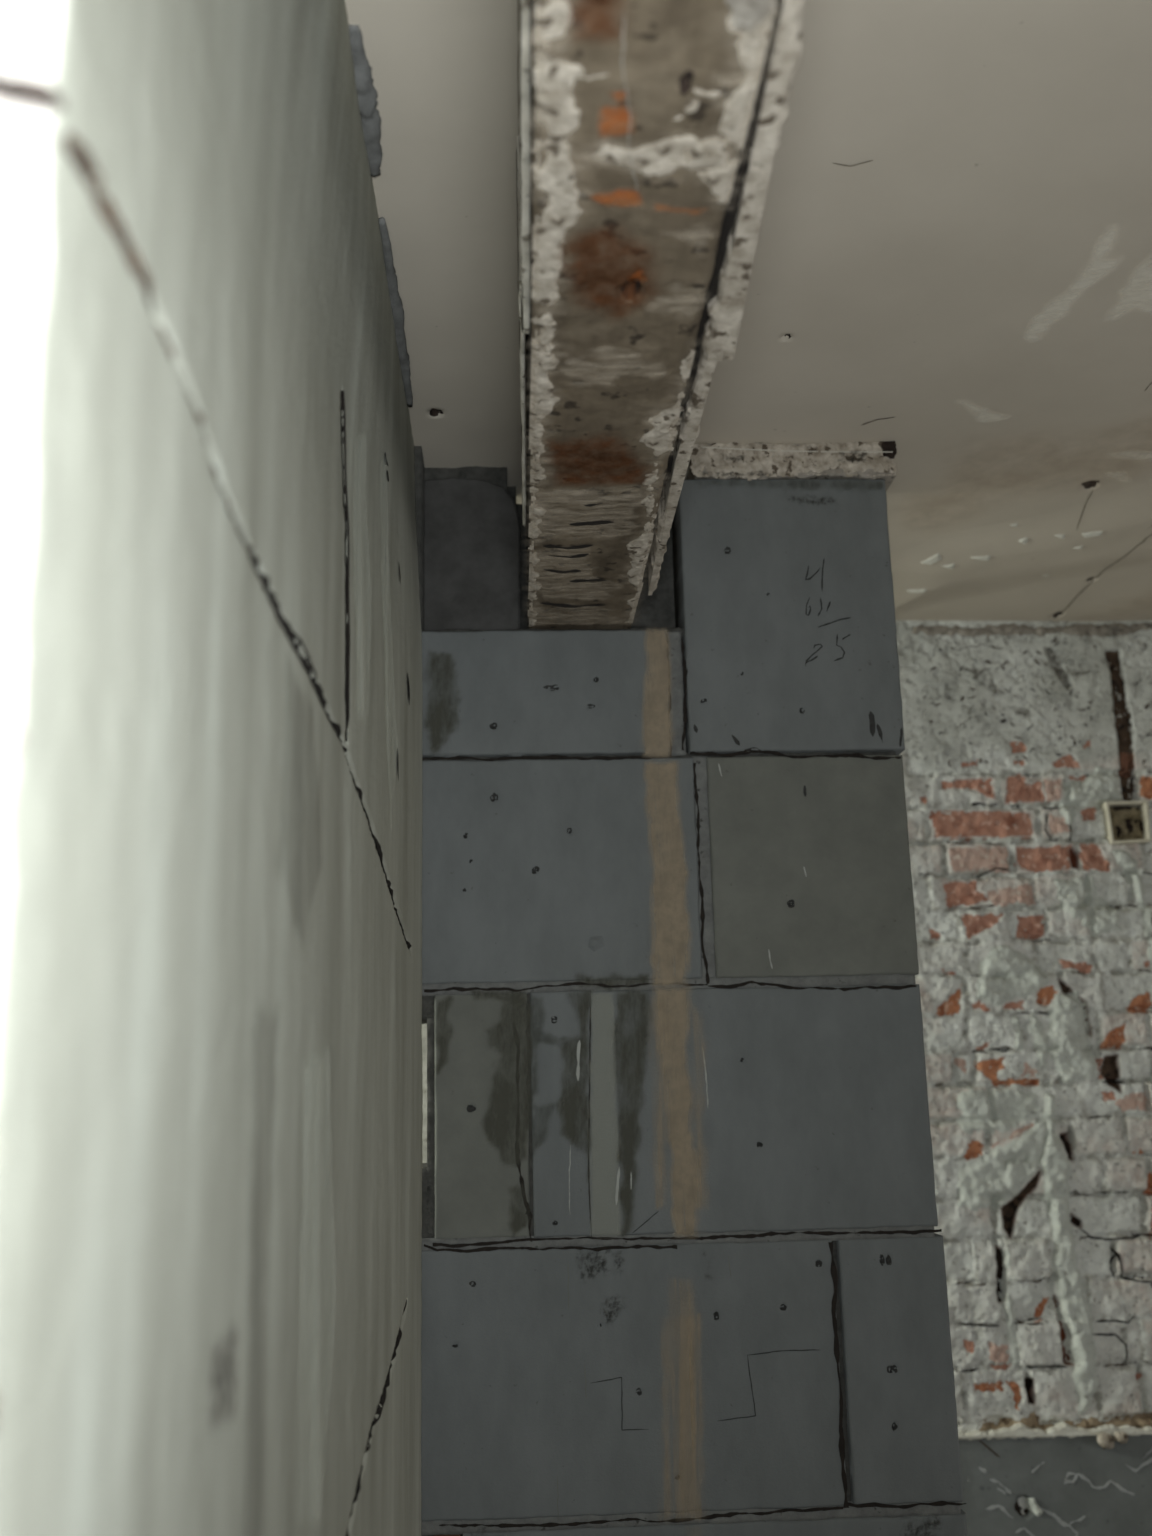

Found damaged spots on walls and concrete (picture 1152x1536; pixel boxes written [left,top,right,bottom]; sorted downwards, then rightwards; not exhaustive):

peeling [592,0,777,204]
peeling [528,0,695,627]
spalling [912,622,1152,638]
spalling [920,740,1110,940]
water stain [436,997,452,1073]
water stain [472,990,532,1163]
spalling [935,959,1152,1112]
crack [962,1321,999,1329]
spalling [963,1340,1034,1410]
spalling [995,1171,1040,1302]
crack [1027,1362,1066,1370]
crack [1081,1229,1152,1362]